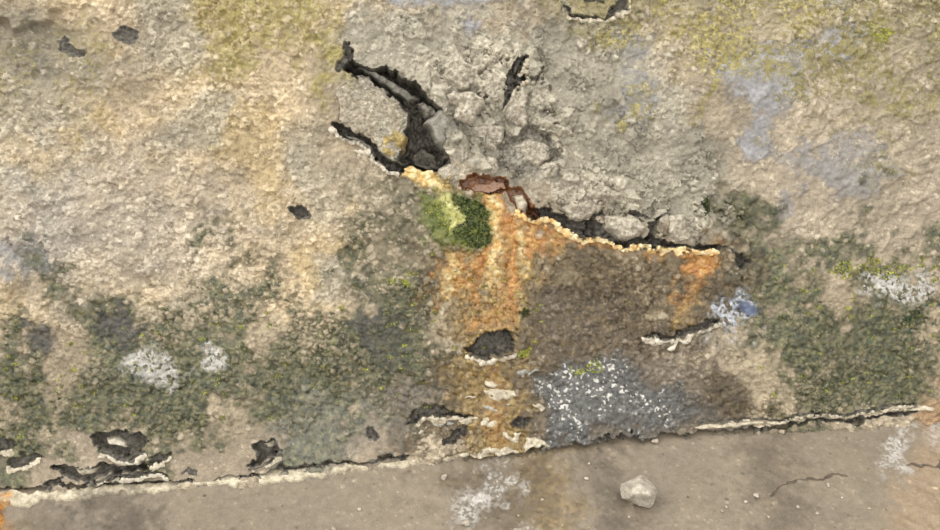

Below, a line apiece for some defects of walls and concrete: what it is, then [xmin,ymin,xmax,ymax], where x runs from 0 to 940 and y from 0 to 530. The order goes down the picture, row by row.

crack [561,0,632,23]
spalling [328,41,575,221]
corrosion [401,166,451,194]
spalling [463,329,517,366]
corrosion [440,192,567,456]
damp [495,240,768,458]
corrosion [671,251,718,327]
damp [787,274,933,404]
spalling [50,428,170,488]
crack [0,435,409,492]
damp [59,352,363,447]
crack [406,369,935,459]